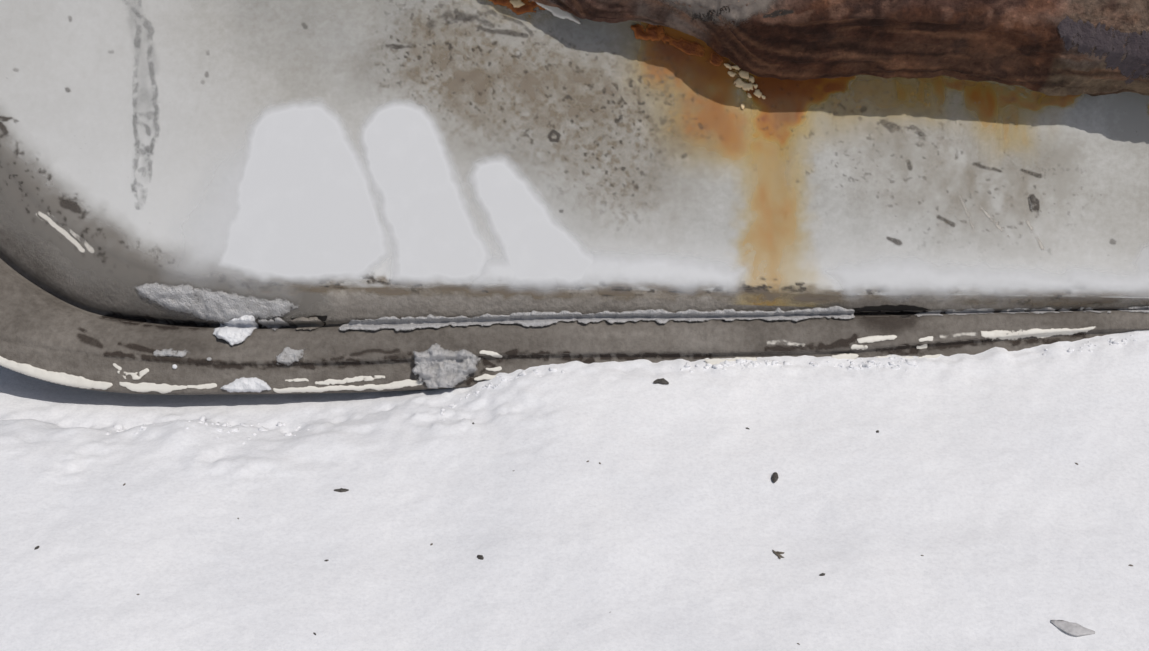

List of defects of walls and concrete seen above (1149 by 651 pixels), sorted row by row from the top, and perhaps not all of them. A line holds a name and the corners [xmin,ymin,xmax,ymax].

corrosion [489,0,546,18]
corrosion [631,22,1081,304]
peeling [831,326,1095,359]
peeling [0,356,217,394]
peeling [273,375,424,393]
peeling [474,350,502,381]
peeling [704,357,757,365]